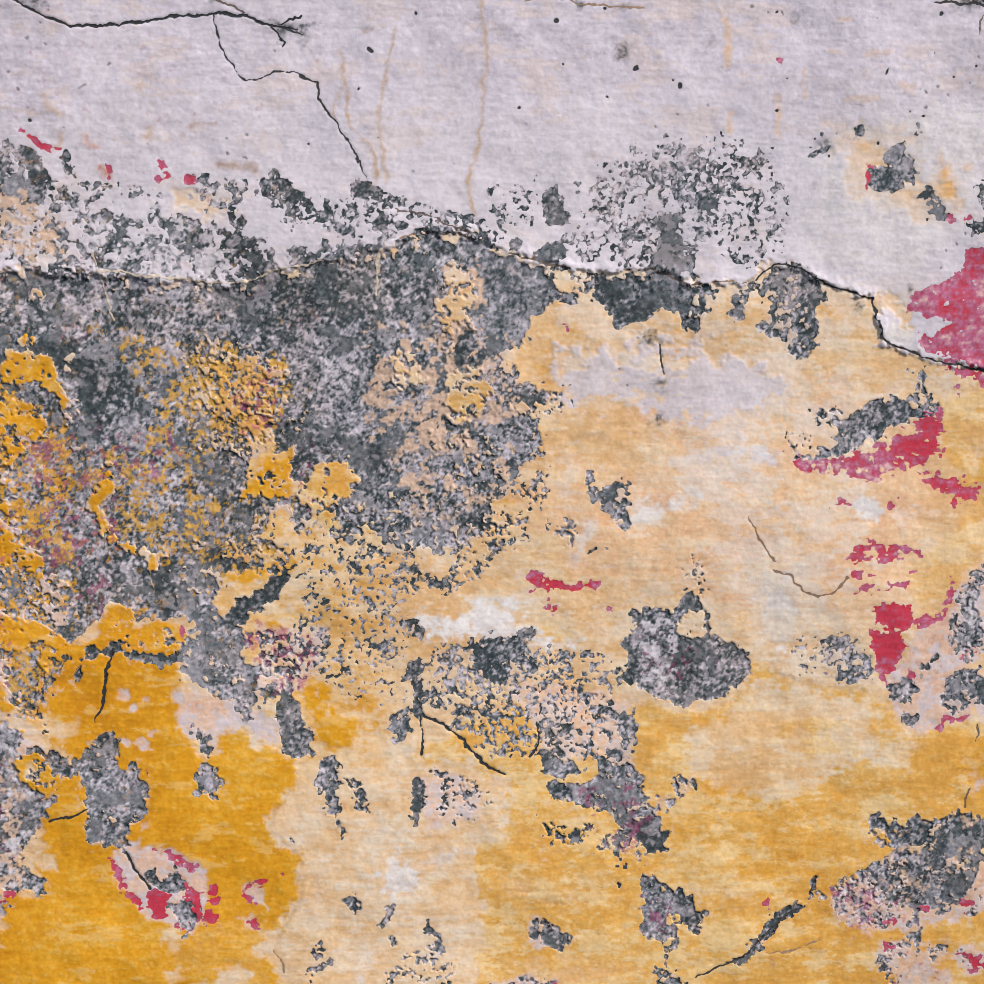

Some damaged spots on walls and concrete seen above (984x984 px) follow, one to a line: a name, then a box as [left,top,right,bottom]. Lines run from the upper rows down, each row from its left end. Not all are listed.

crack [934,0,984,31]
crack [14,0,367,178]
crack [375,207,477,299]
crack [642,263,984,372]
peeling [906,247,984,398]
peeling [783,365,981,509]
spalling [0,128,828,939]
peeling [791,538,984,733]
crack [420,713,506,775]
spalling [638,874,709,984]
crack [695,875,818,978]
spalling [724,808,984,984]